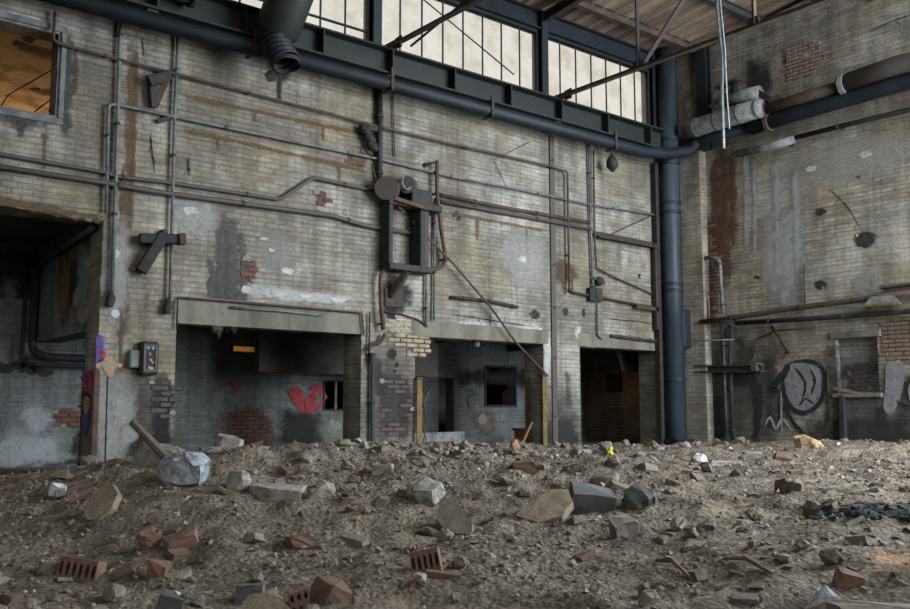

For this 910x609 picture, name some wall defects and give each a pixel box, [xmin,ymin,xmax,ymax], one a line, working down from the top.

water stain [0,115,46,137]
corrosion [119,47,139,248]
spalling [0,197,106,223]
peeling [174,199,218,236]
peeling [103,223,132,329]
peeling [238,256,367,307]
flaking render [707,224,724,317]
corrosion [117,259,130,371]
flaking render [384,311,431,359]
flaking render [878,317,910,364]
flaking render [51,408,80,429]